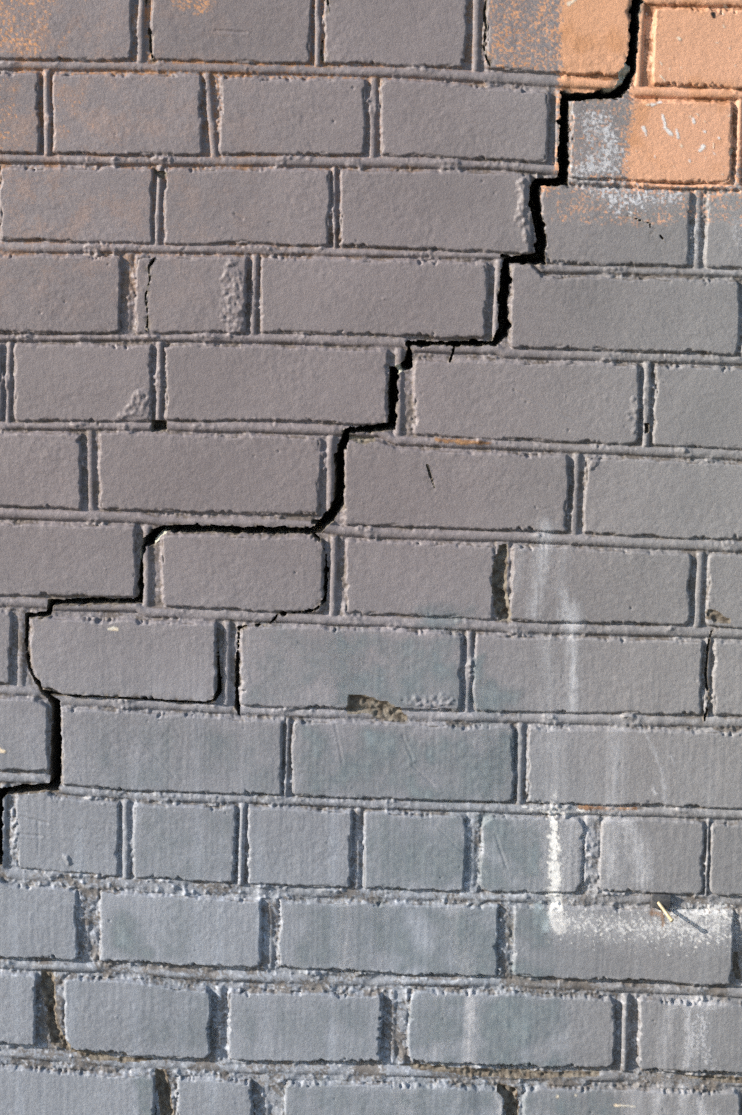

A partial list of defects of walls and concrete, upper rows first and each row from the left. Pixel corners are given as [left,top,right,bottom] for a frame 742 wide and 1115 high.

crack [0,0,645,866]
crack [703,630,712,721]